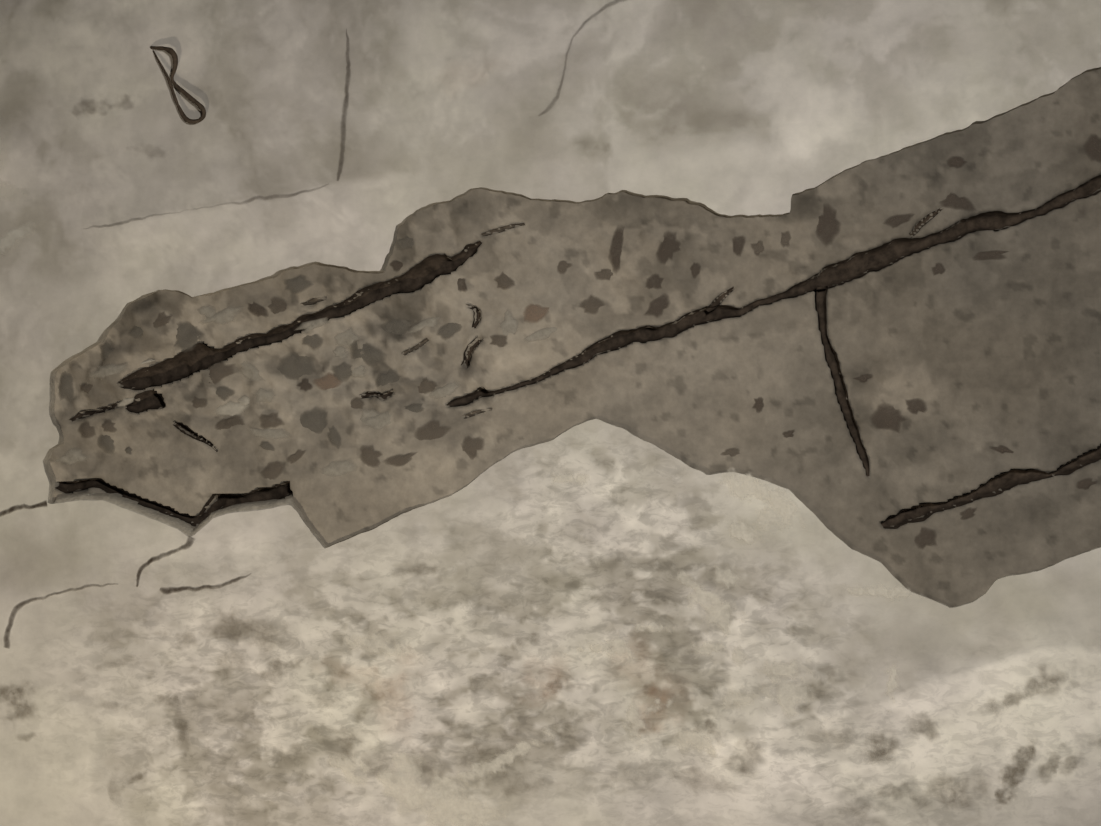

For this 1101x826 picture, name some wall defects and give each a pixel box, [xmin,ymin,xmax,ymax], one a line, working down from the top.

crack [69,223,525,452]
crack [445,175,1101,476]
crack [0,478,293,594]
crack [881,444,1101,529]
crack [5,593,59,648]